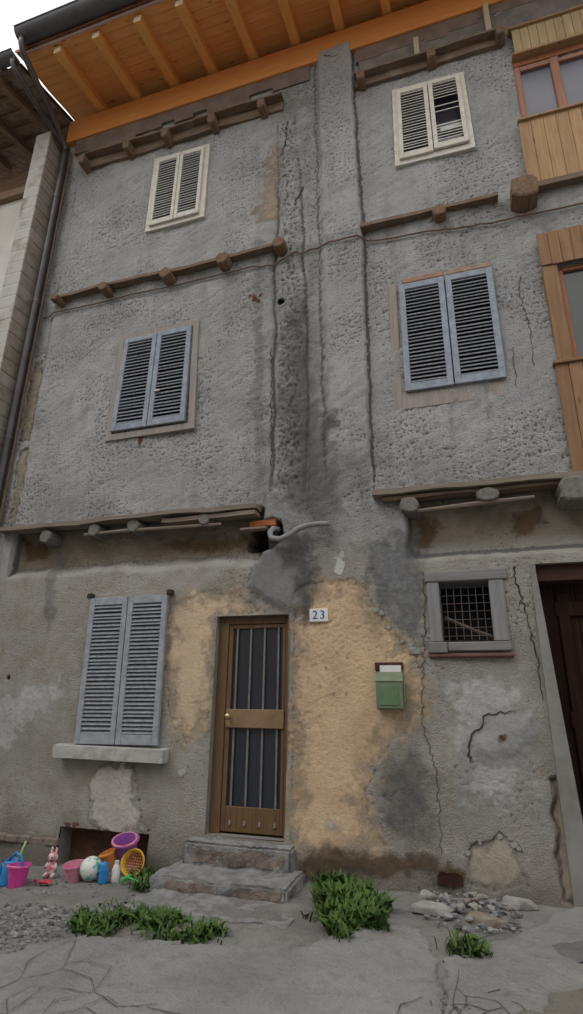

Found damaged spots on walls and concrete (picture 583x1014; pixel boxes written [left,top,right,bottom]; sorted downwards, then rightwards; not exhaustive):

damp [366,517,440,642]
crack [513,566,543,698]
crack [421,571,443,856]
crack [467,710,516,763]
damp [301,848,437,879]
spalling [437,834,522,889]
crack [430,989,527,1014]